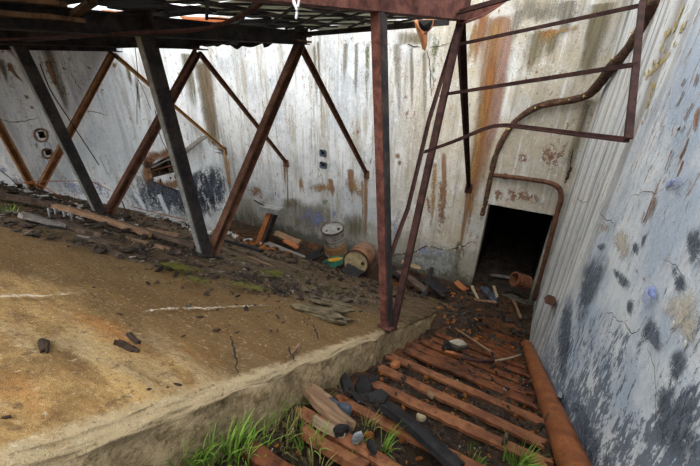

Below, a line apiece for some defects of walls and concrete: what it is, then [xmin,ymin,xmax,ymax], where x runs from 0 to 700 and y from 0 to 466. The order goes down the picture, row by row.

water stain [343,43,369,93]
water stain [188,61,219,141]
rust [460,14,512,249]
water stain [133,178,186,216]
spalling [142,149,178,189]
water stain [192,170,225,216]
rust [315,179,335,195]
rust [347,169,368,229]
crack [394,241,473,256]
crack [230,336,239,373]
peeling [638,319,660,349]
peeling [663,268,695,378]